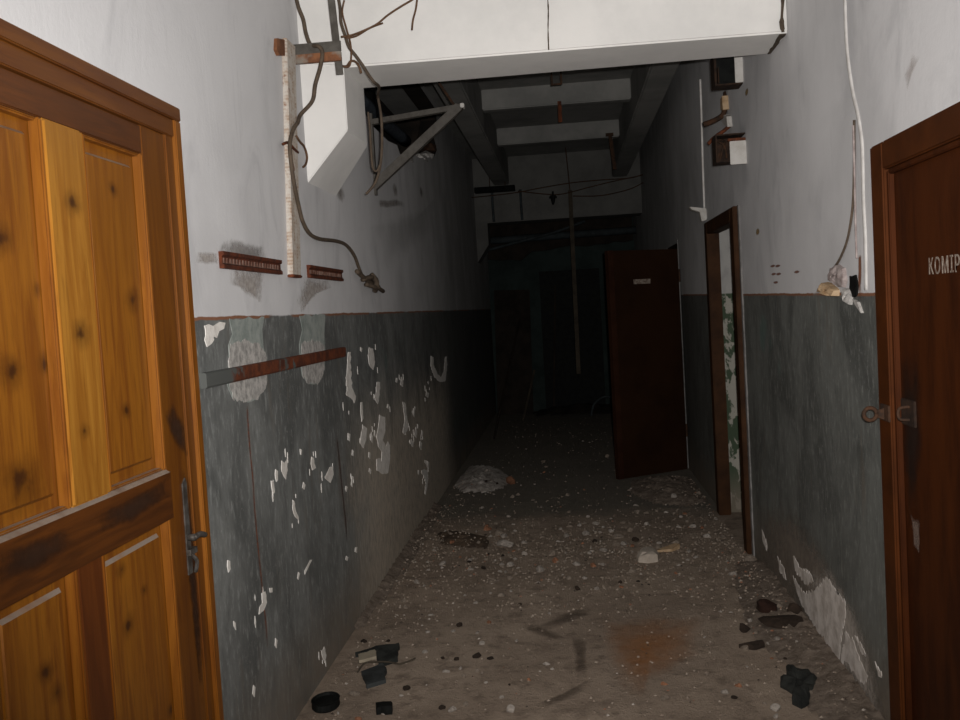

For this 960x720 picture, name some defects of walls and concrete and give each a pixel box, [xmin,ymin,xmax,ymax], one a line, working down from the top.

water stain [228,244,259,256]
peeling [204,316,267,368]
peeling [299,282,326,385]
peeling [227,375,267,403]
peeling [343,345,390,474]
peeling [271,450,288,500]
peeling [292,449,334,528]
peeling [254,588,273,628]
peeling [777,556,882,703]